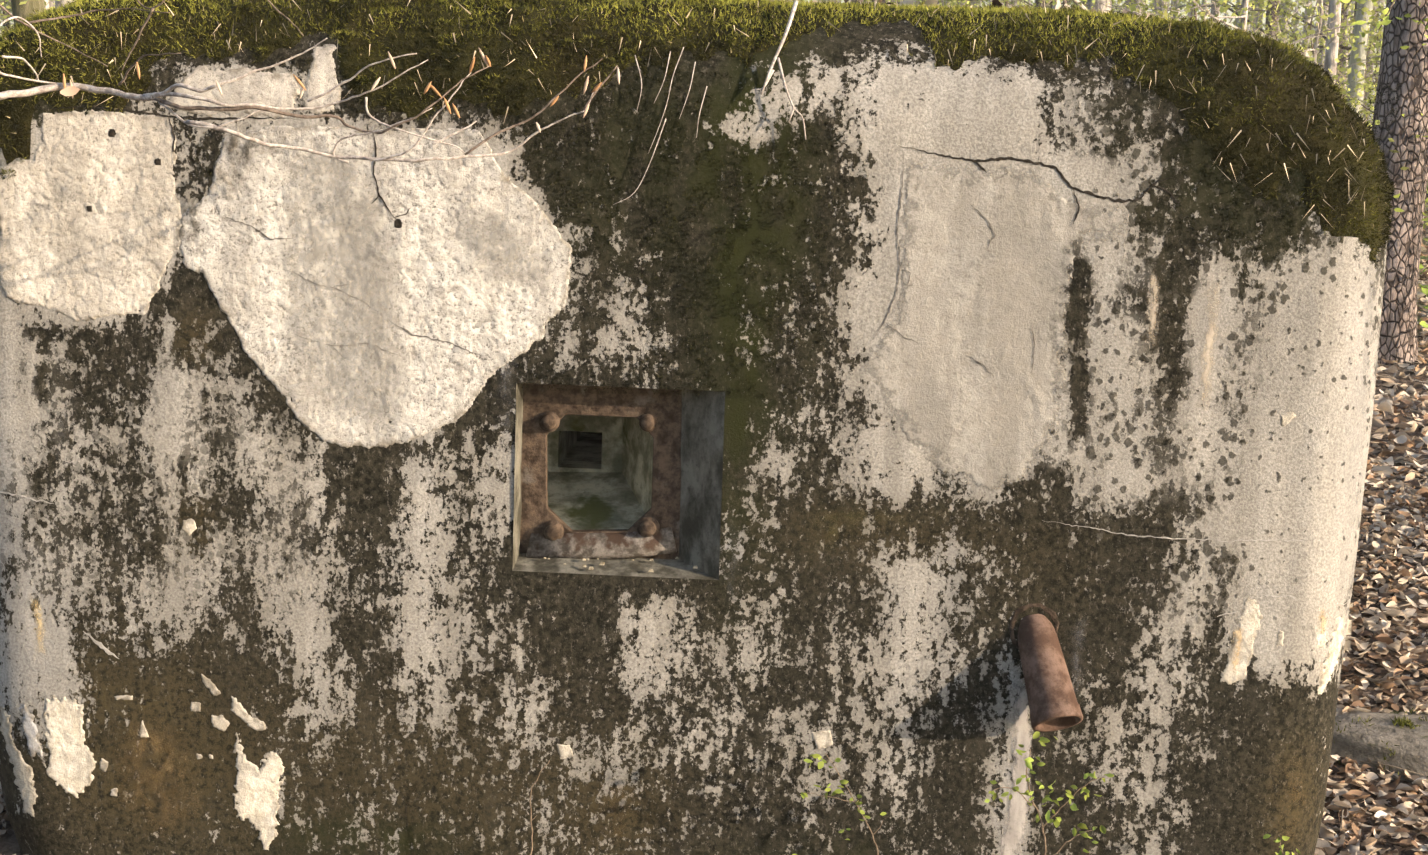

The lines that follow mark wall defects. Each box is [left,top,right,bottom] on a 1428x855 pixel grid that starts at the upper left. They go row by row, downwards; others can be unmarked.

spalling [0,44,572,449]
damp [291,156,388,411]
crack [870,146,1188,343]
crack [1029,321,1037,377]
damp [1201,313,1215,398]
efflorescence [1220,596,1263,685]
damp [1316,603,1353,694]
damp [0,694,108,817]
damp [201,674,286,850]
damp [1001,685,1033,855]